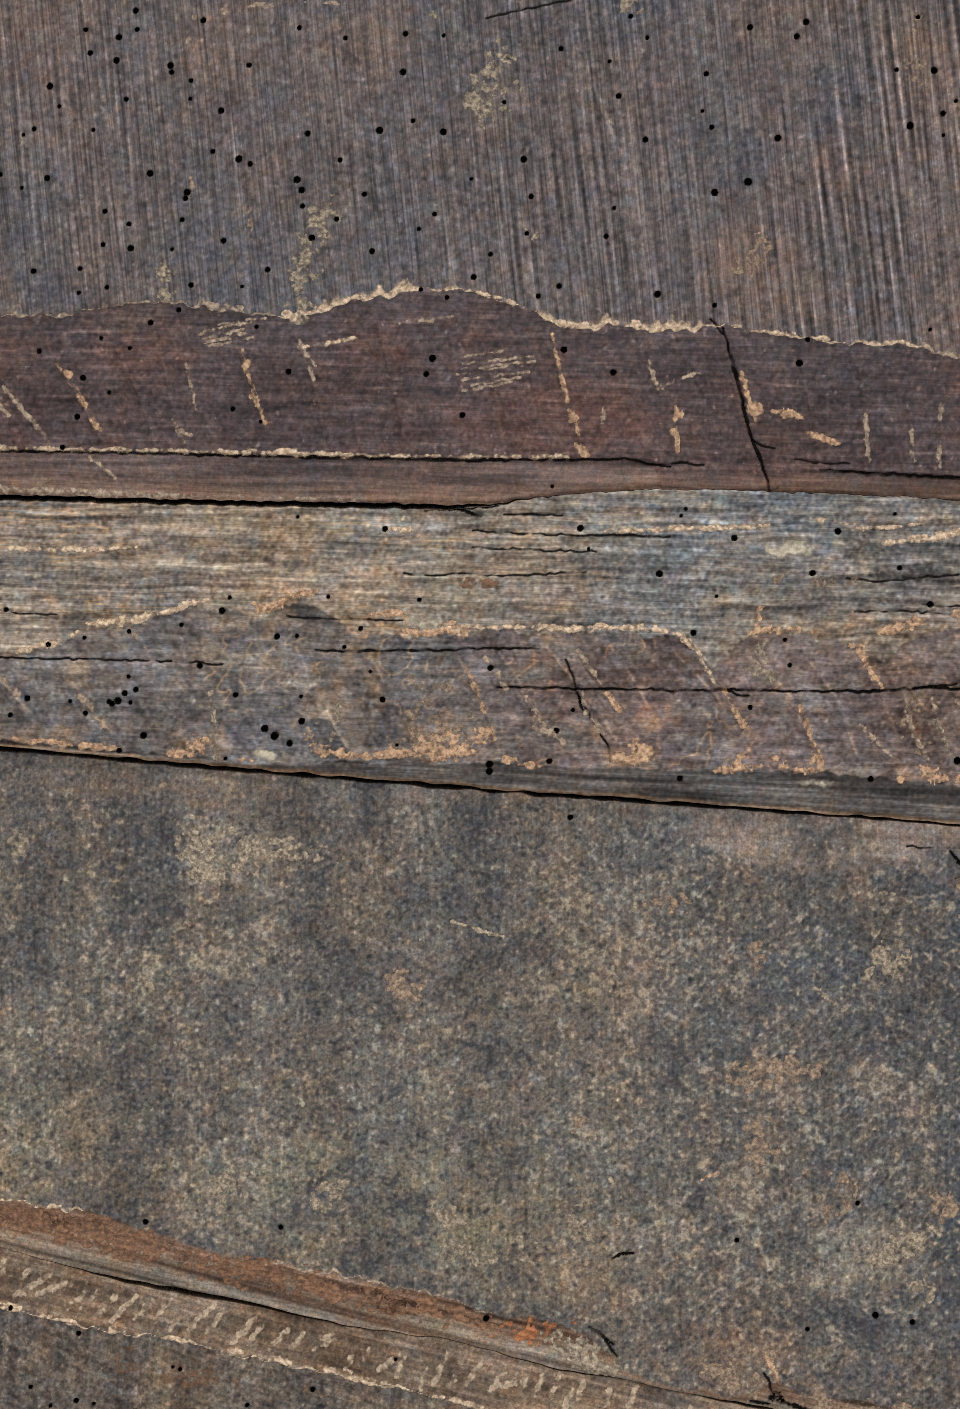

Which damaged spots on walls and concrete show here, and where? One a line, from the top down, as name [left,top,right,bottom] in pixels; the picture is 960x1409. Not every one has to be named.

crack [485,0,571,19]
crack [710,319,960,482]
crack [750,1373,806,1409]